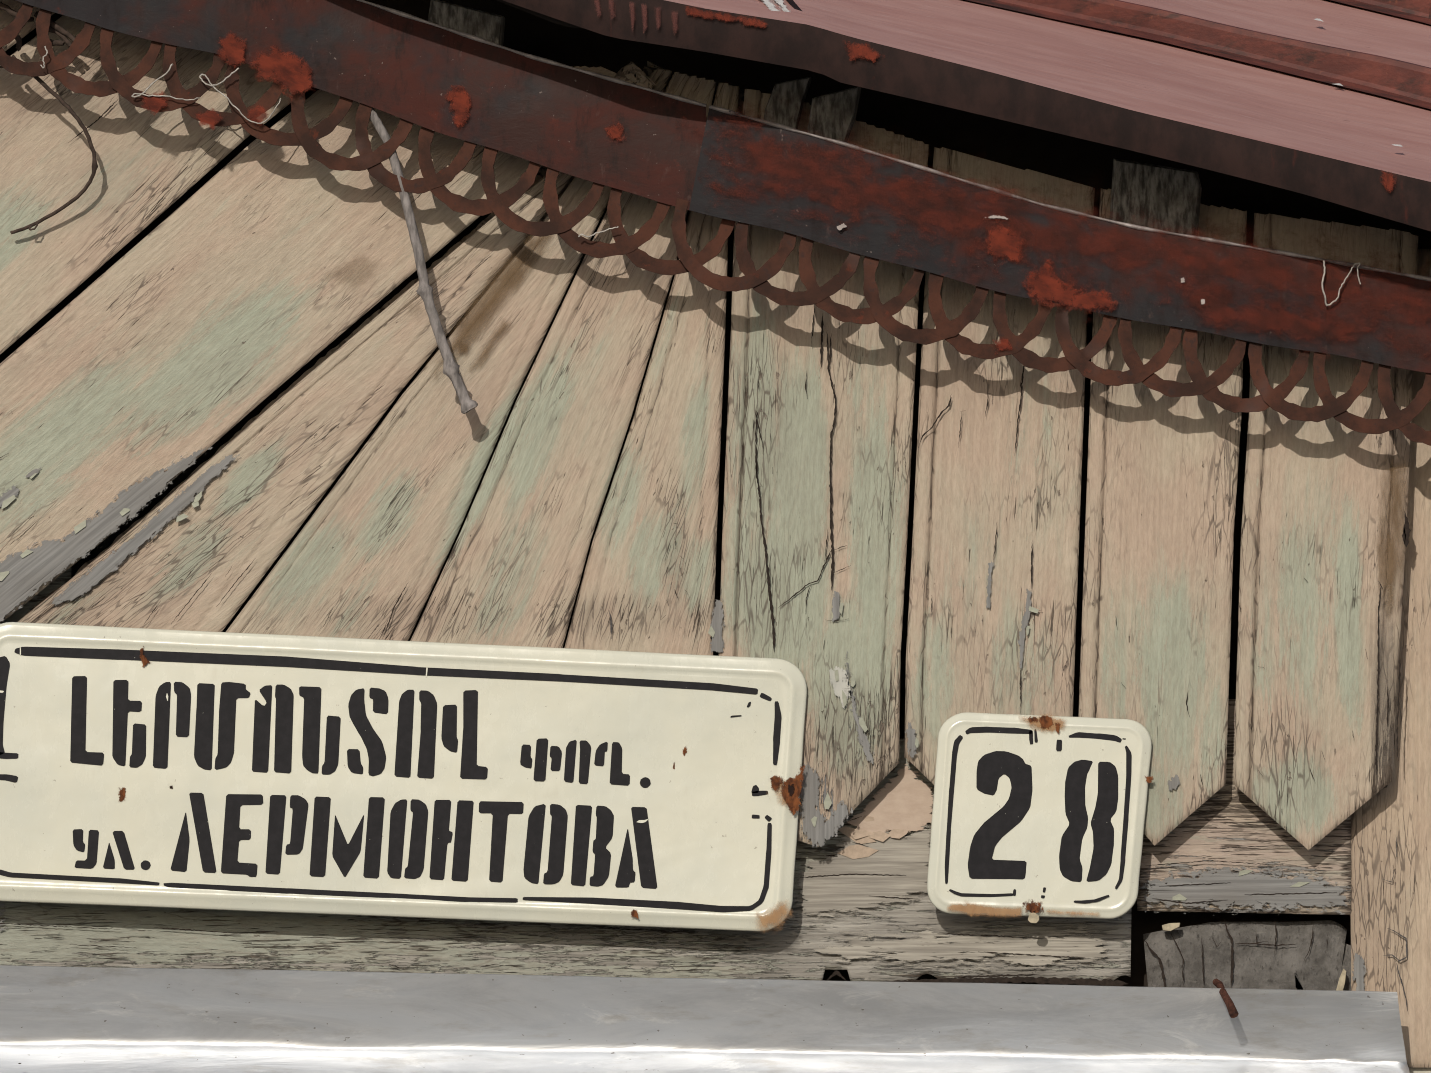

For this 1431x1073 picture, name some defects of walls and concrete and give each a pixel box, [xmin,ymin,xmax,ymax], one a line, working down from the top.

rust [142,91,167,113]
rust [218,33,313,98]
rust [686,6,766,27]
rust [845,42,879,62]
rust [711,111,1431,340]
crack [755,304,851,649]
peeling [0,447,239,621]
peeling [827,651,874,764]
rust [1022,715,1064,734]
rust [770,765,805,815]
peeling [796,722,1110,972]
crack [1384,928,1408,1011]